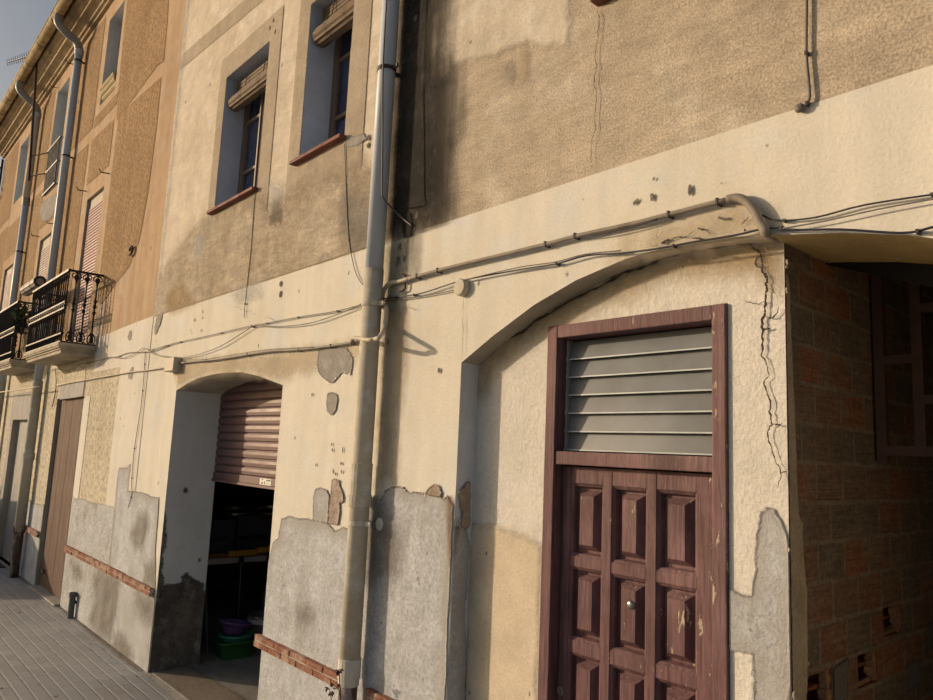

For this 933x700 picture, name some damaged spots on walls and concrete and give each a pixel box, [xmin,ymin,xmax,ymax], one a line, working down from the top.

damp [385,0,455,281]
peeling [60,464,159,673]
peeling [258,650,338,700]
peeling [263,443,348,670]
spalling [316,347,352,415]
peeling [357,481,472,700]
crack [511,216,786,489]
peeling [729,259,832,700]
spalling [858,649,878,689]